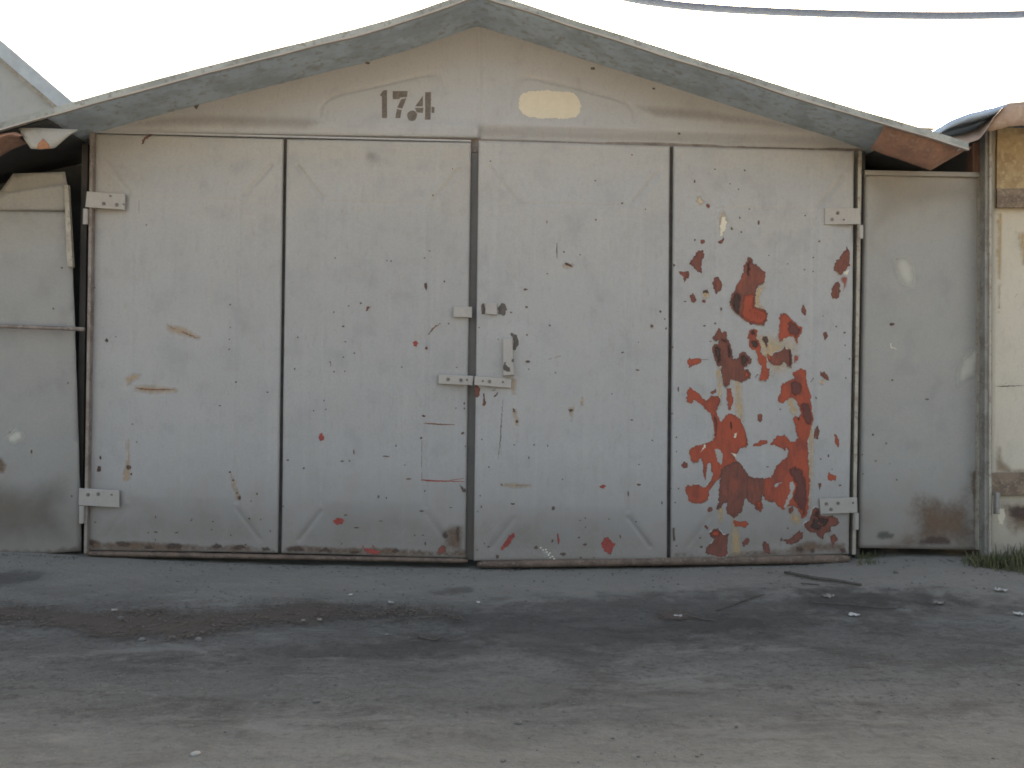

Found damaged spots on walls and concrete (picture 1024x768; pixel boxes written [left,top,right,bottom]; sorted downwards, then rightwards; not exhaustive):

peeling [718,217,727,244]
peeling [679,240,705,282]
peeling [831,247,851,299]
peeling [681,256,840,557]
peeling [601,537,615,554]